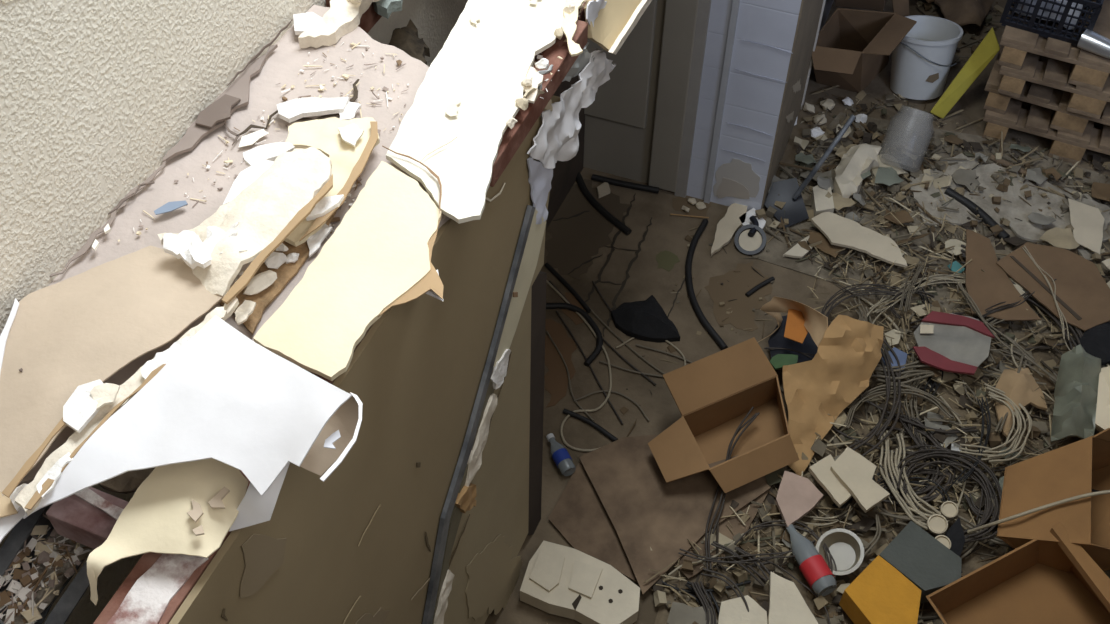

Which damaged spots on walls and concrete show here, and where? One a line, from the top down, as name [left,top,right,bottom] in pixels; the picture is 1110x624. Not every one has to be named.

spalling [162,44,278,162]
crack [568,193,652,336]